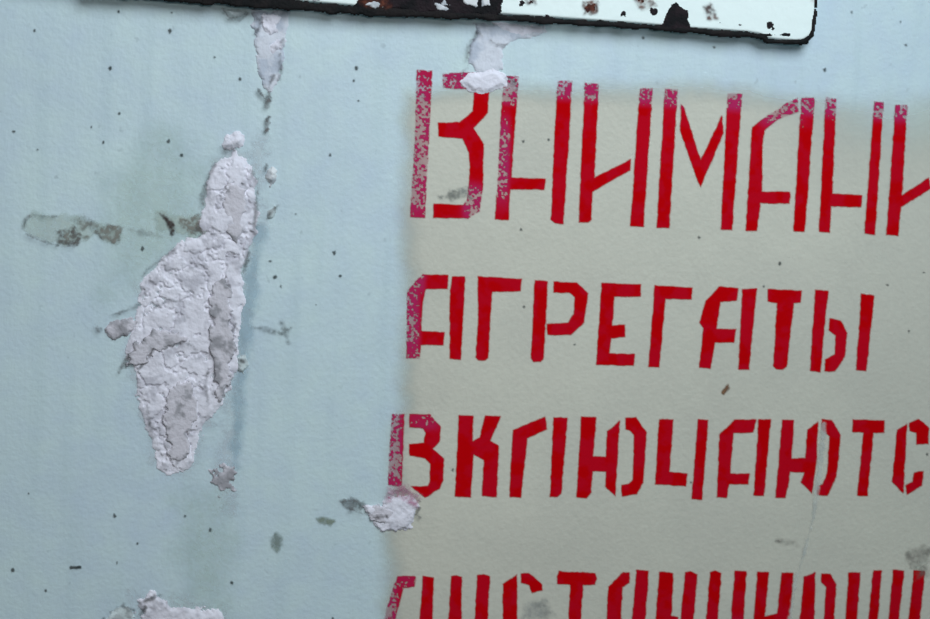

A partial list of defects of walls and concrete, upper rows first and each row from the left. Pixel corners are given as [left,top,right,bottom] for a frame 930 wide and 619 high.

peeling [221,7,290,132]
peeling [460,21,547,94]
flaking render [96,131,277,475]
flaking render [208,463,237,498]
flaking render [341,486,421,532]
flaking render [103,590,224,619]